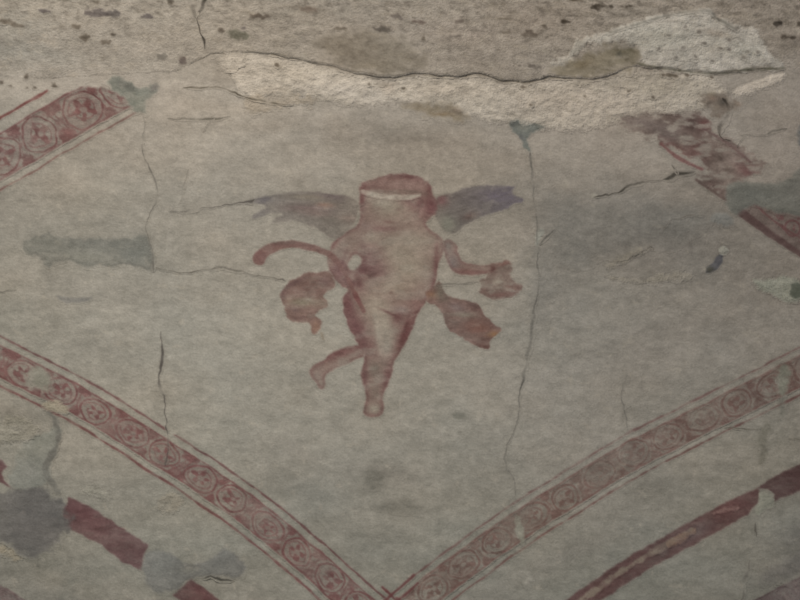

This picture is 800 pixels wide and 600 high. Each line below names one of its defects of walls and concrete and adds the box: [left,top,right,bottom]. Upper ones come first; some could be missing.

crack [184,0,210,49]
flaking render [211,6,800,134]
flaking render [568,0,636,13]
crack [594,165,696,198]
crack [502,153,556,495]
crack [155,331,171,465]